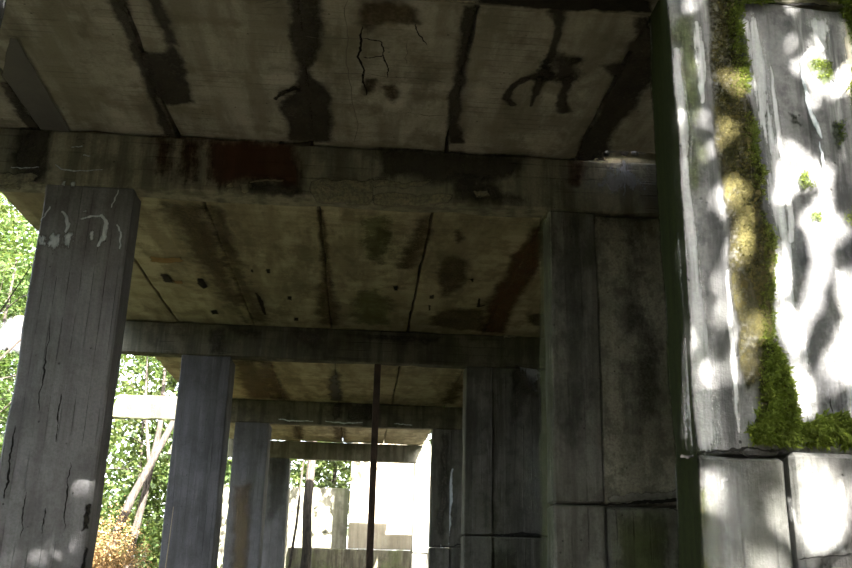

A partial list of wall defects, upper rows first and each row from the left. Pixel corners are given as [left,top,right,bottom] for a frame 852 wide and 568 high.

water stain [110,0,193,136]
water stain [274,0,332,142]
crack [307,1,442,142]
water stain [379,6,520,202]
water stain [502,8,581,114]
water stain [801,51,824,169]
water stain [743,20,811,417]
crack [38,326,62,441]
crack [3,427,72,538]
crack [601,498,677,511]
crack [680,446,785,459]
crack [799,552,852,560]